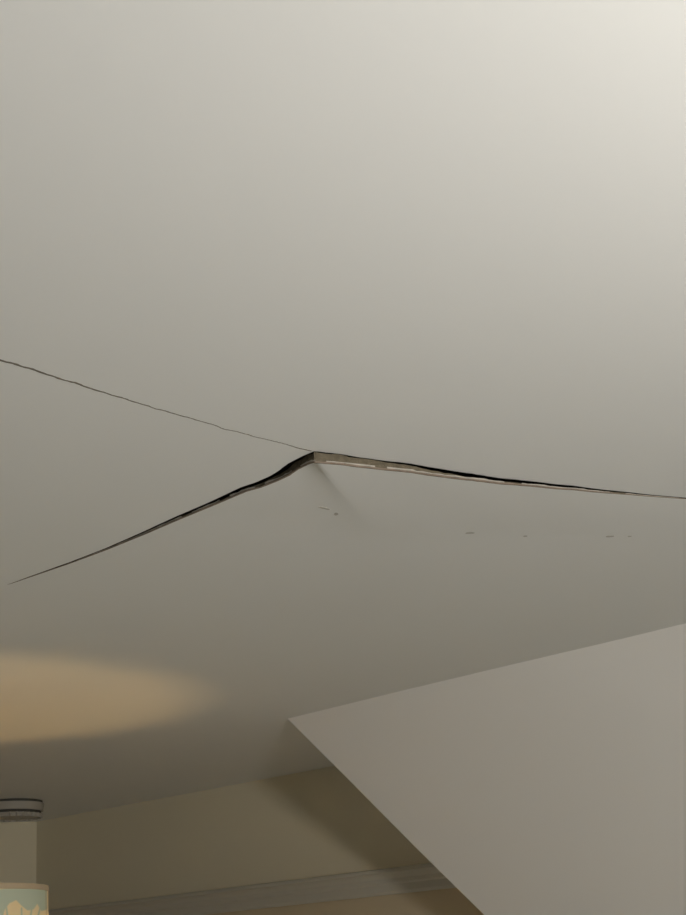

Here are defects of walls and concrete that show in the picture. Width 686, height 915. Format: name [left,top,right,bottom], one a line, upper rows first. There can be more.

crack [0,359,686,584]